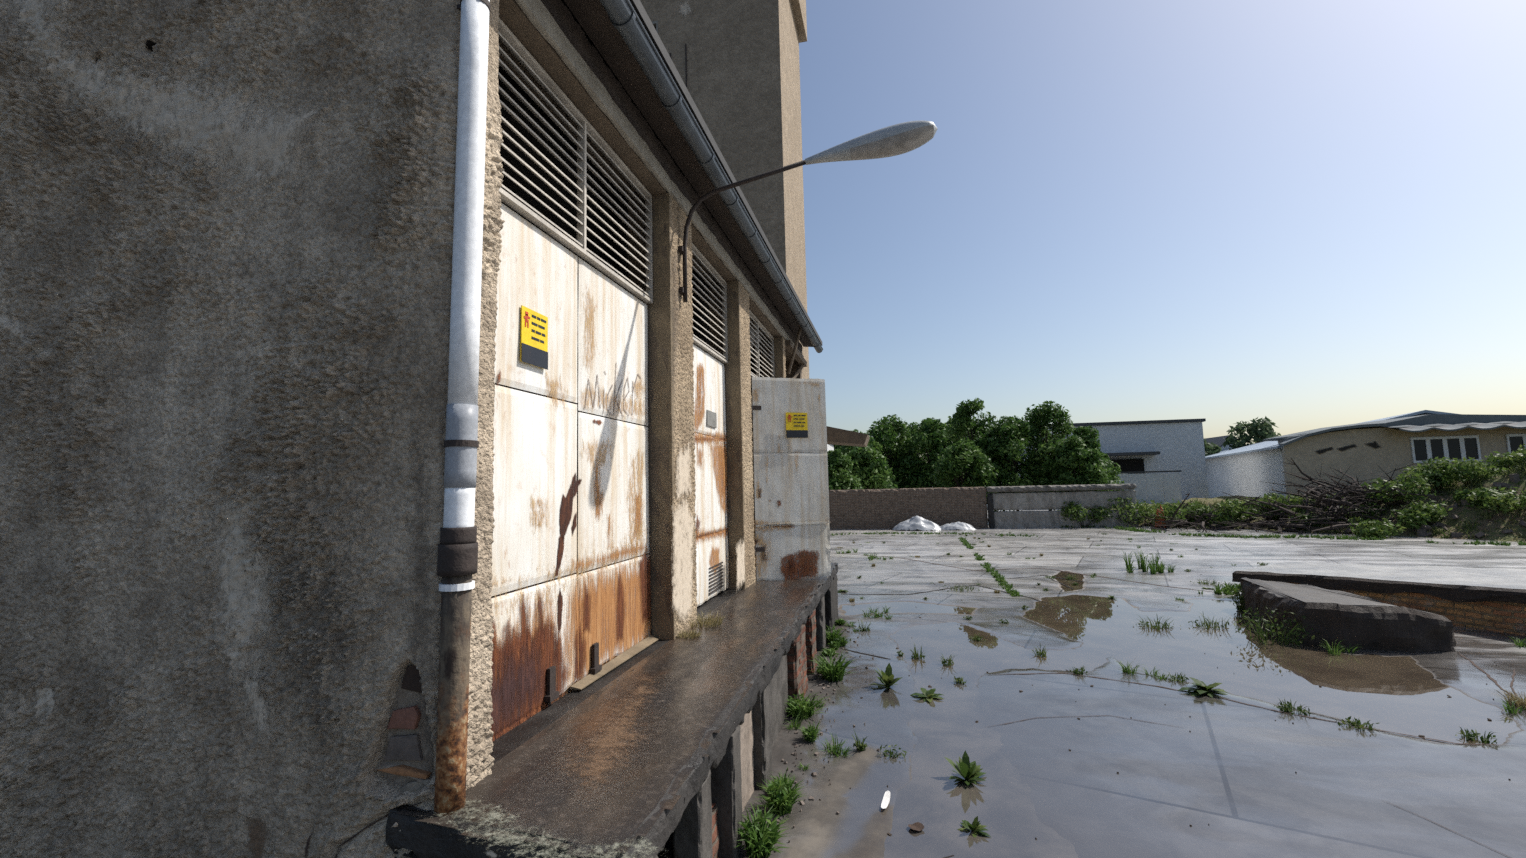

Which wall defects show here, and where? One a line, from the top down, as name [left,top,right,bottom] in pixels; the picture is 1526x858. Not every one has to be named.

corrosion [546,372,646,424]
corrosion [490,443,651,742]
corrosion [694,365,728,572]
corrosion [754,482,820,580]
spalling [374,664,434,792]
corrosion [586,686,647,779]